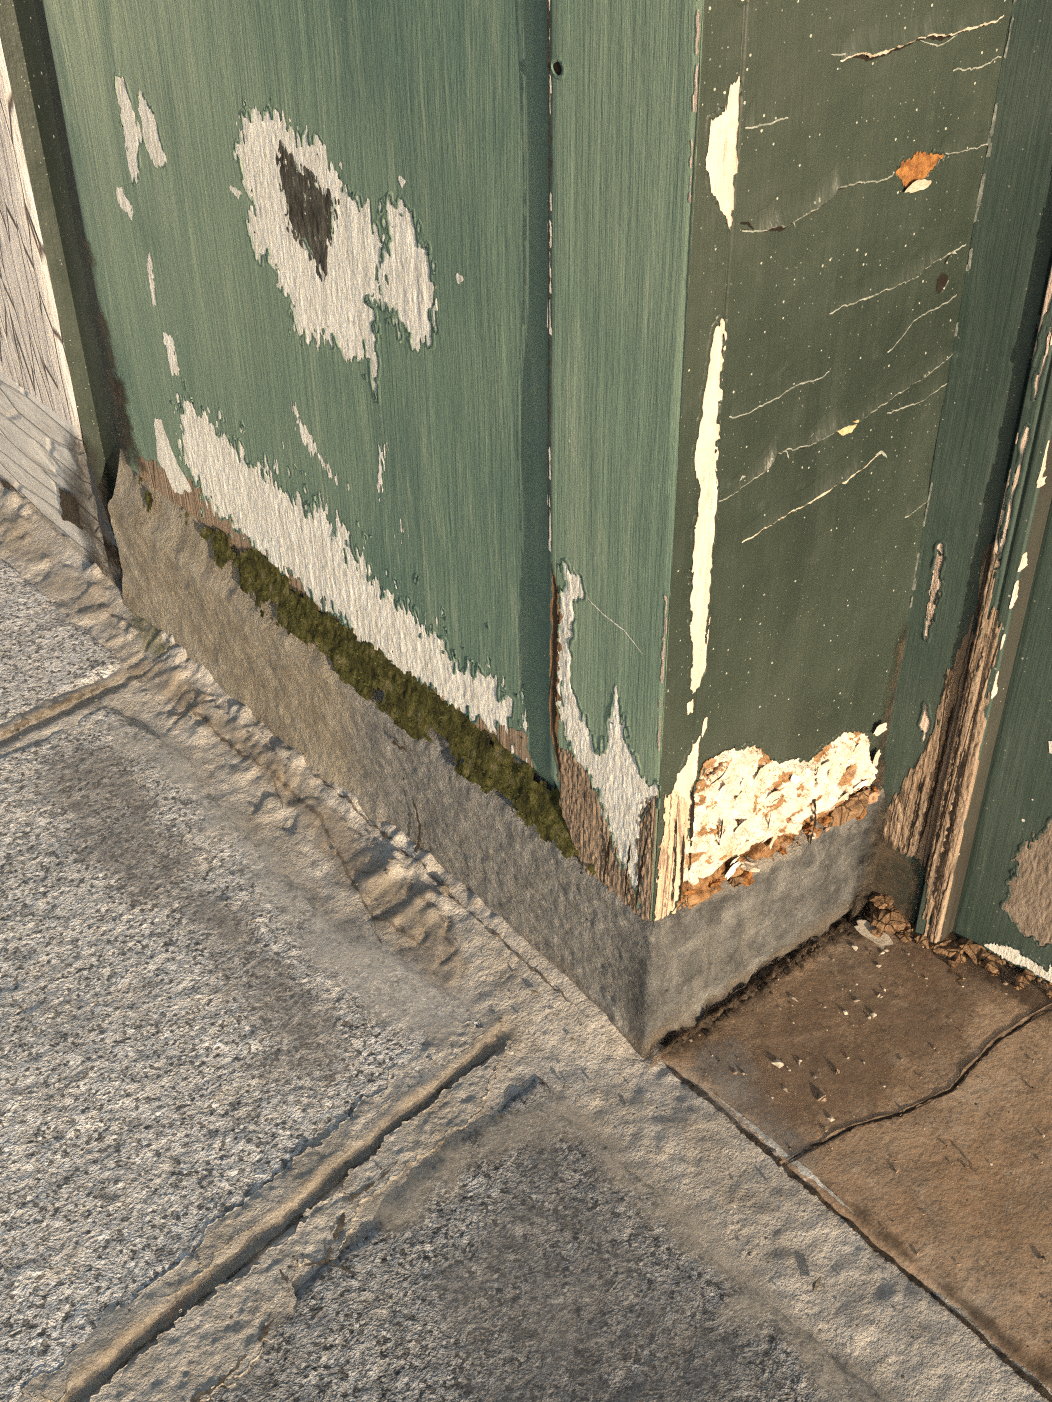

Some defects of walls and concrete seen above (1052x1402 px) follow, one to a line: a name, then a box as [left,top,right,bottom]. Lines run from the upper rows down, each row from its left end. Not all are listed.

peeling [230,98,440,405]
peeling [154,332,530,763]
peeling [547,0,729,891]
peeling [689,0,743,234]
crack [741,158,898,233]
crack [719,231,968,543]
crack [831,0,1007,71]
peeling [984,423,1050,609]
peeling [755,723,887,807]
peeling [982,816,1052,983]
crack [83,1043,503,1402]
crack [666,1003,1052,1402]